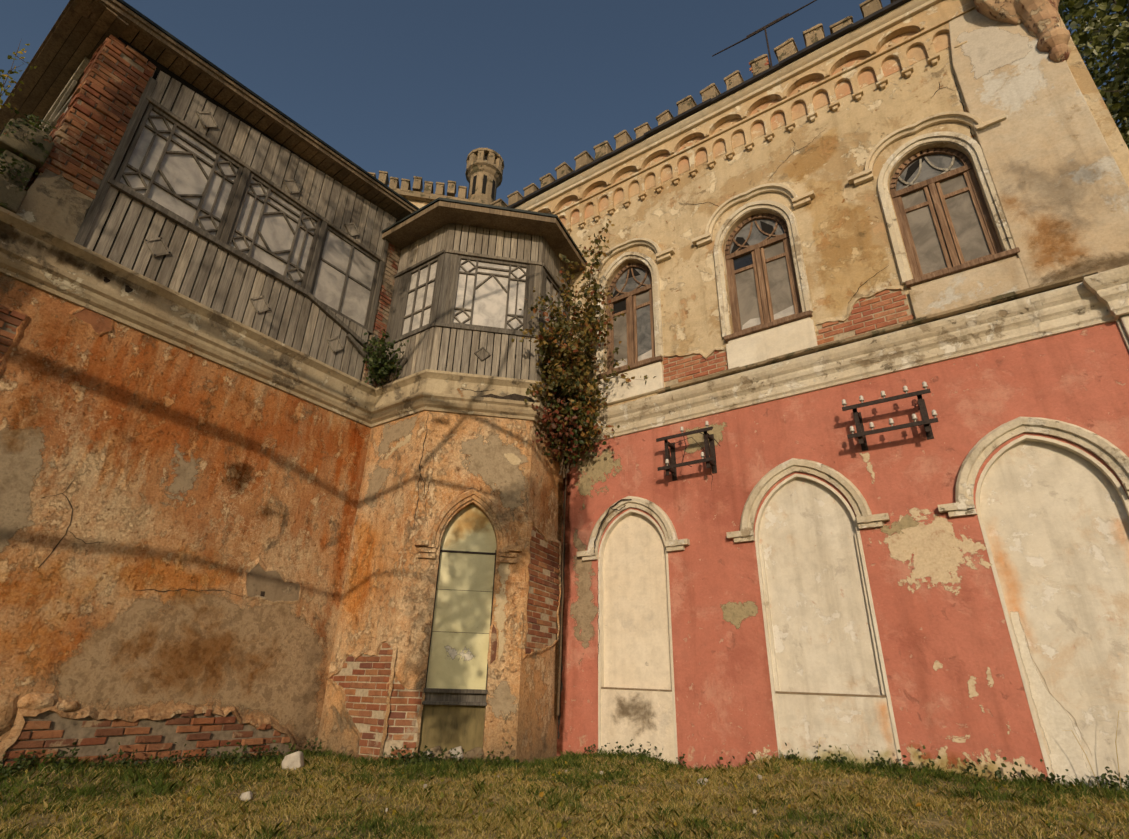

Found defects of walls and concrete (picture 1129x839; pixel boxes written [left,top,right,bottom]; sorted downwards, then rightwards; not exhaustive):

flaking render [957,26,1032,79]
flaking render [0,303,30,379]
flaking render [661,346,728,387]
flaking render [814,285,916,345]
leakage [161,443,202,505]
flaking render [575,448,625,510]
flaking render [460,432,598,664]
peeling [869,507,992,595]
leakage [554,452,690,755]
flaking render [721,601,758,629]
flaking render [0,558,425,769]